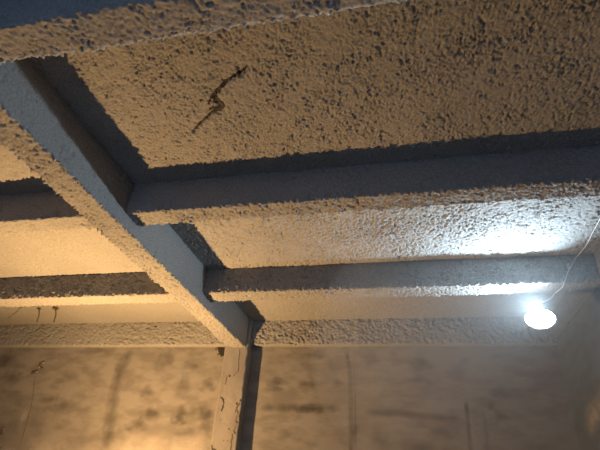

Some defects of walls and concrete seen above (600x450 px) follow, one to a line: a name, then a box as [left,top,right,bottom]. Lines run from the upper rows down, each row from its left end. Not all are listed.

crack [193,67,247,131]